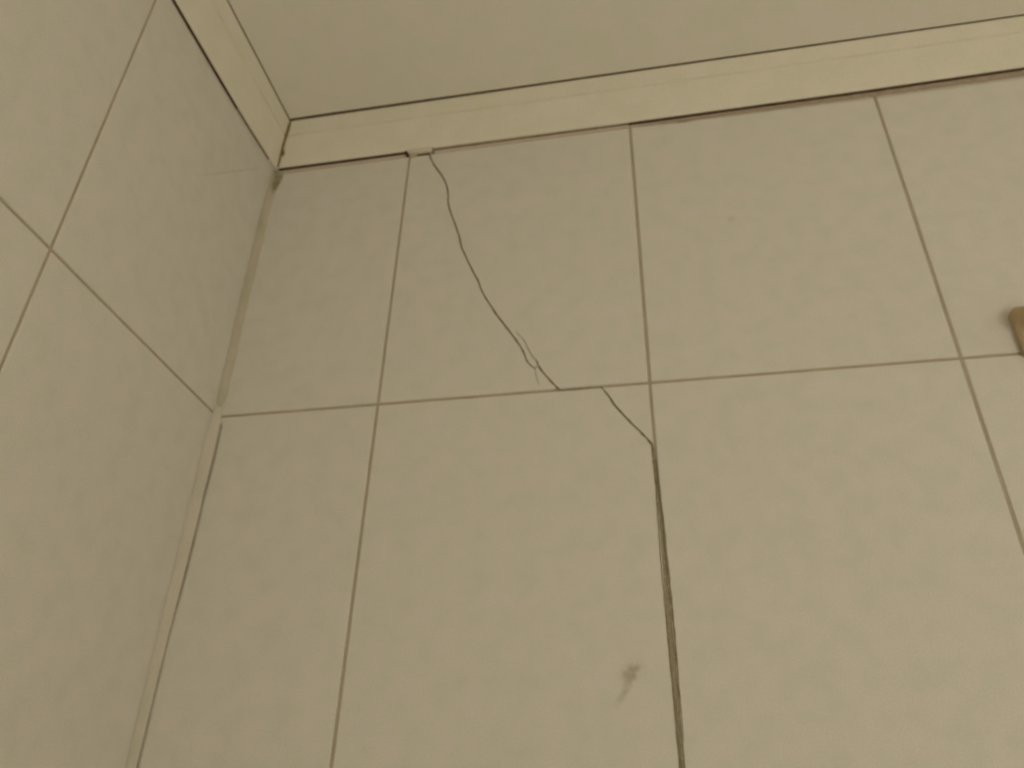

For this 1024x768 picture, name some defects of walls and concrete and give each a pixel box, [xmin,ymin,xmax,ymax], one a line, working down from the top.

crack [405,147,684,768]